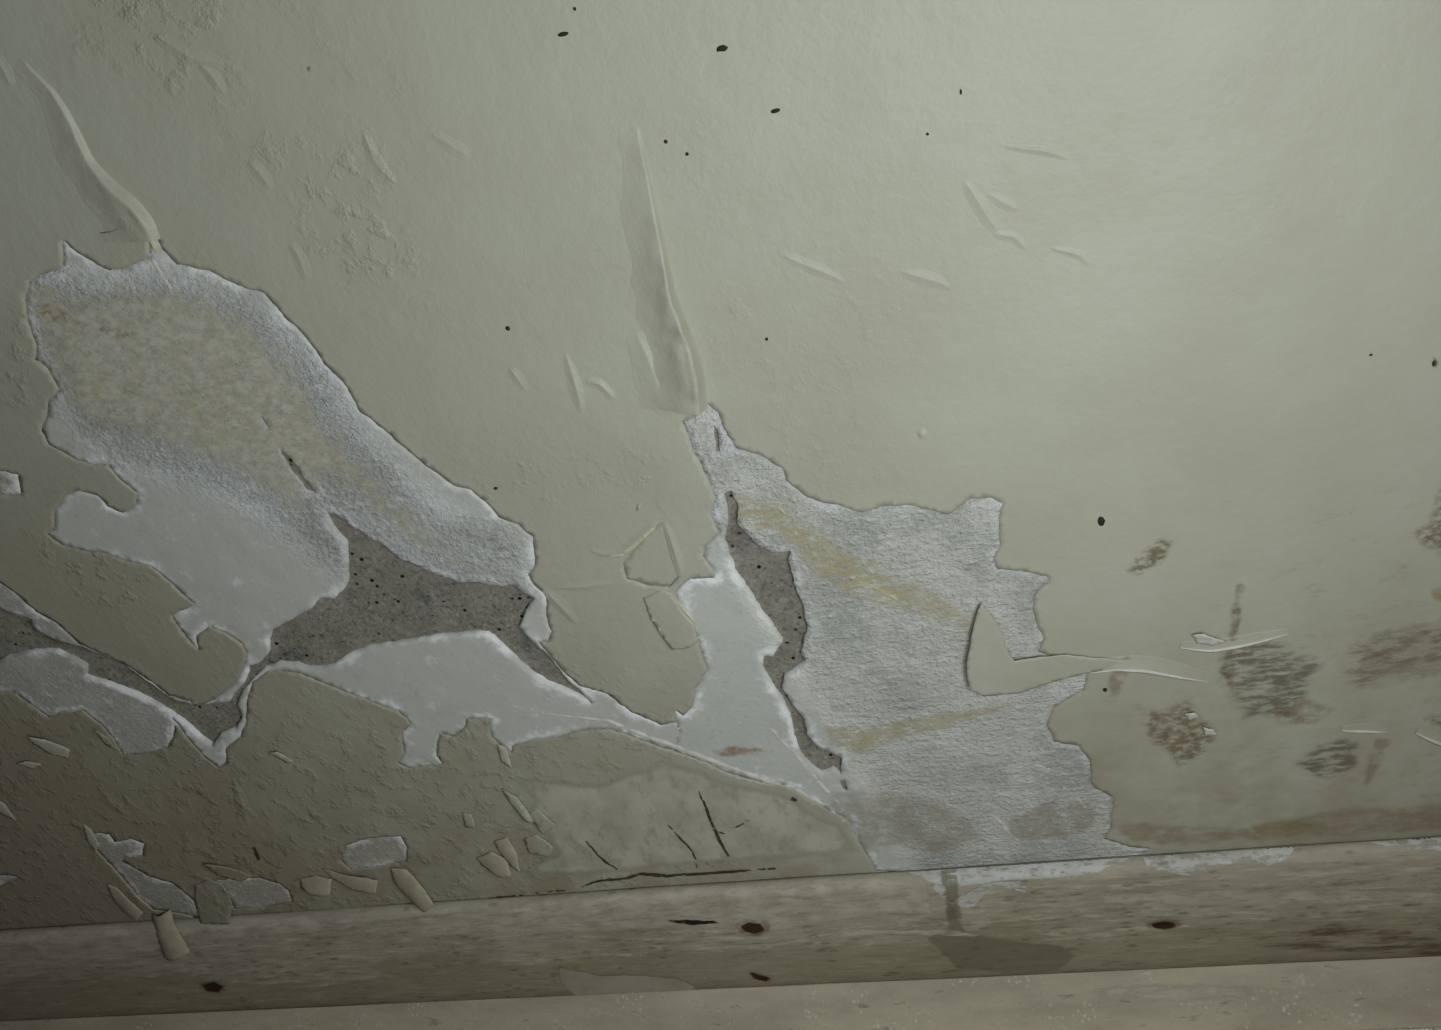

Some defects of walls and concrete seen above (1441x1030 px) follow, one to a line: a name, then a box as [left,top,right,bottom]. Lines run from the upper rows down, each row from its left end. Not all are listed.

leakage [1134,541,1168,570]
peeling [0,240,1441,961]
leakage [1232,645,1311,721]
leakage [1150,709,1211,759]
leakage [1302,743,1354,772]
peeling [559,968,695,995]